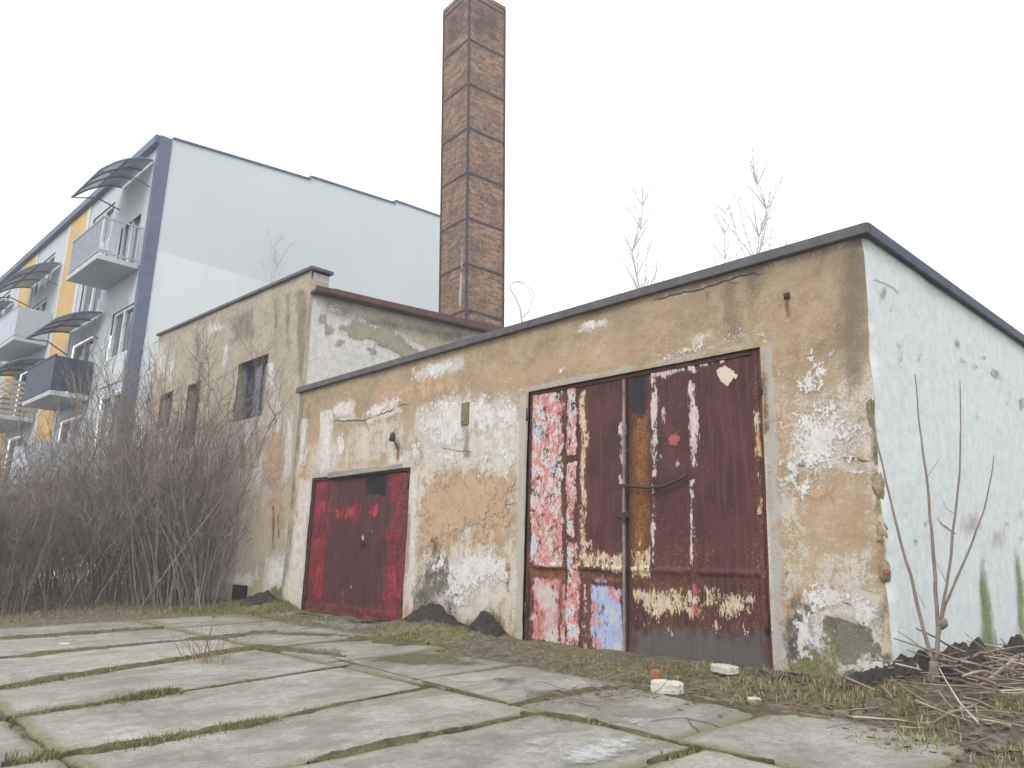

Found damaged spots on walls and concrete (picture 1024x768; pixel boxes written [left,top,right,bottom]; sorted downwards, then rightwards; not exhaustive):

crack [654,271,763,300]
peeling [319,305,420,357]
peeling [576,319,609,335]
crack [336,404,411,430]
peeling [753,344,878,559]
flaking render [236,328,767,651]
corrosion [632,410,651,579]
corrosion [530,569,566,622]
damp [786,598,839,670]
spalling [783,580,887,676]